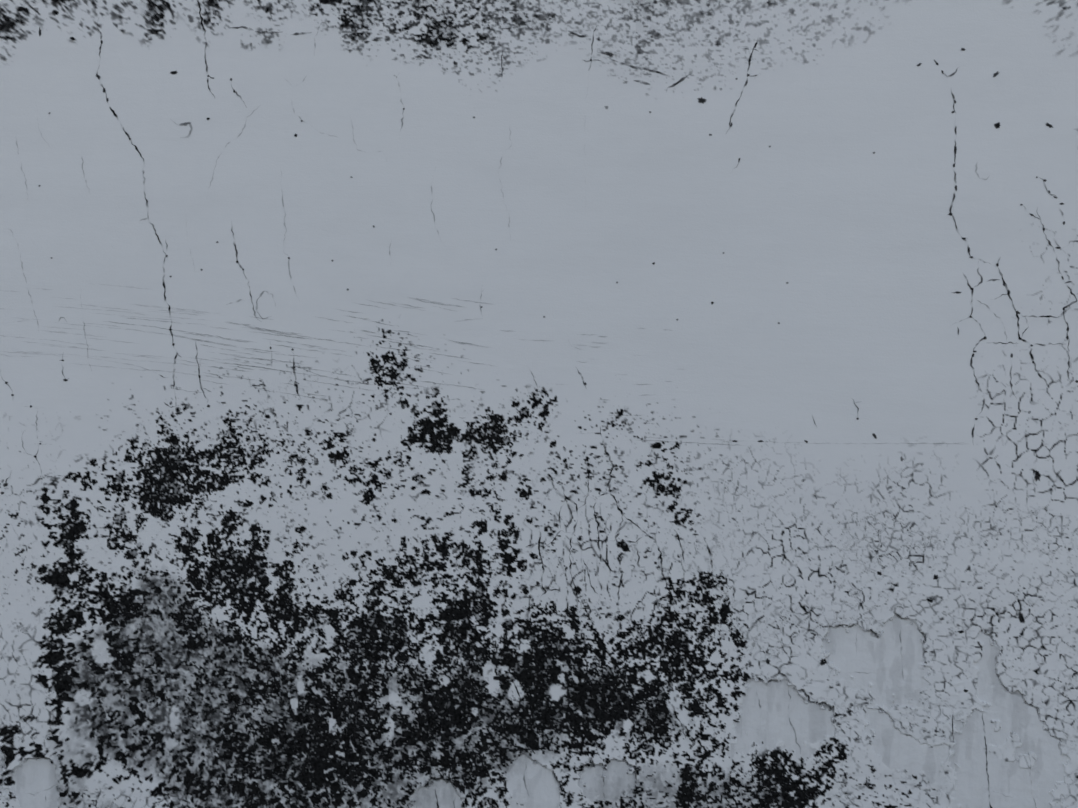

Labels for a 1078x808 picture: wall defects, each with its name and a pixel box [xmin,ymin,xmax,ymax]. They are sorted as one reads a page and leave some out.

water stain [0,0,175,41]
crack [96,32,144,161]
water stain [188,0,231,29]
water stain [245,0,288,43]
water stain [310,0,556,64]
crack [145,198,210,407]
crack [850,60,1078,808]
mould [0,319,920,808]
crack [526,430,932,680]
spalling [0,746,60,808]
spalling [726,678,837,770]
spalling [942,629,1078,808]